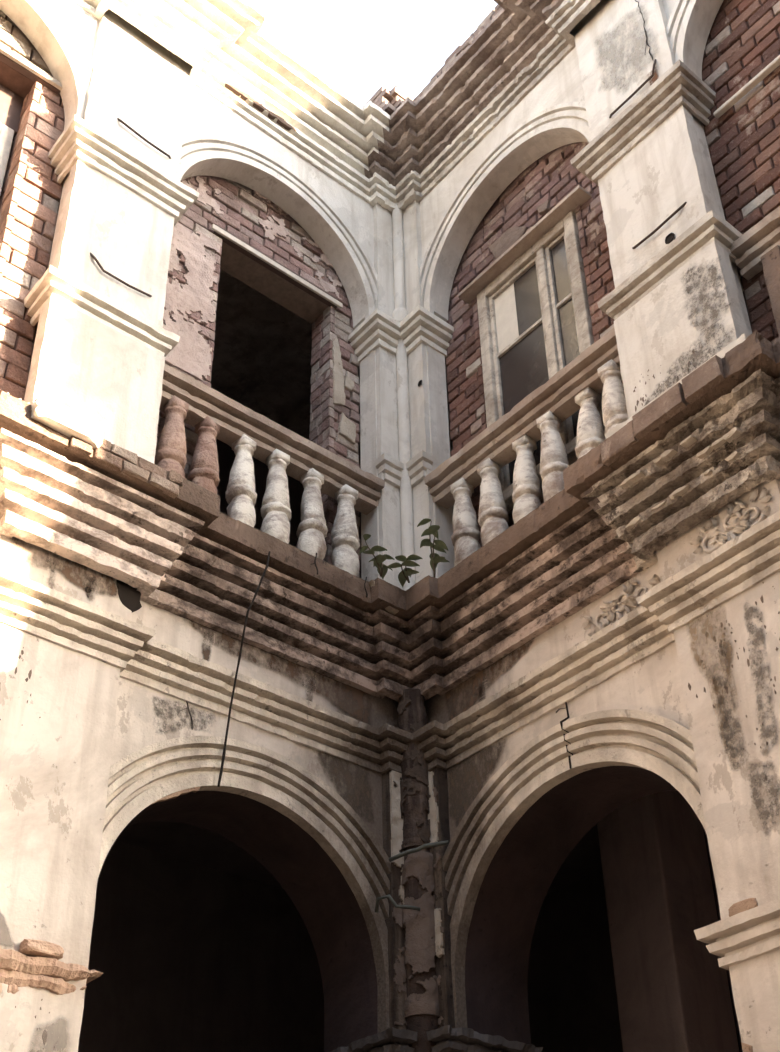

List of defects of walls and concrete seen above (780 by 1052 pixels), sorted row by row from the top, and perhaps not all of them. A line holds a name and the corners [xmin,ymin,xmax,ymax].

crack [635,0,653,60]
flaking render [180,176,224,215]
flaking render [254,191,342,300]
flaking render [163,222,220,381]
damp [644,265,733,406]
crack [556,702,573,769]
damp [688,605,780,834]
damp [0,913,13,947]
flaking render [389,770,444,1027]